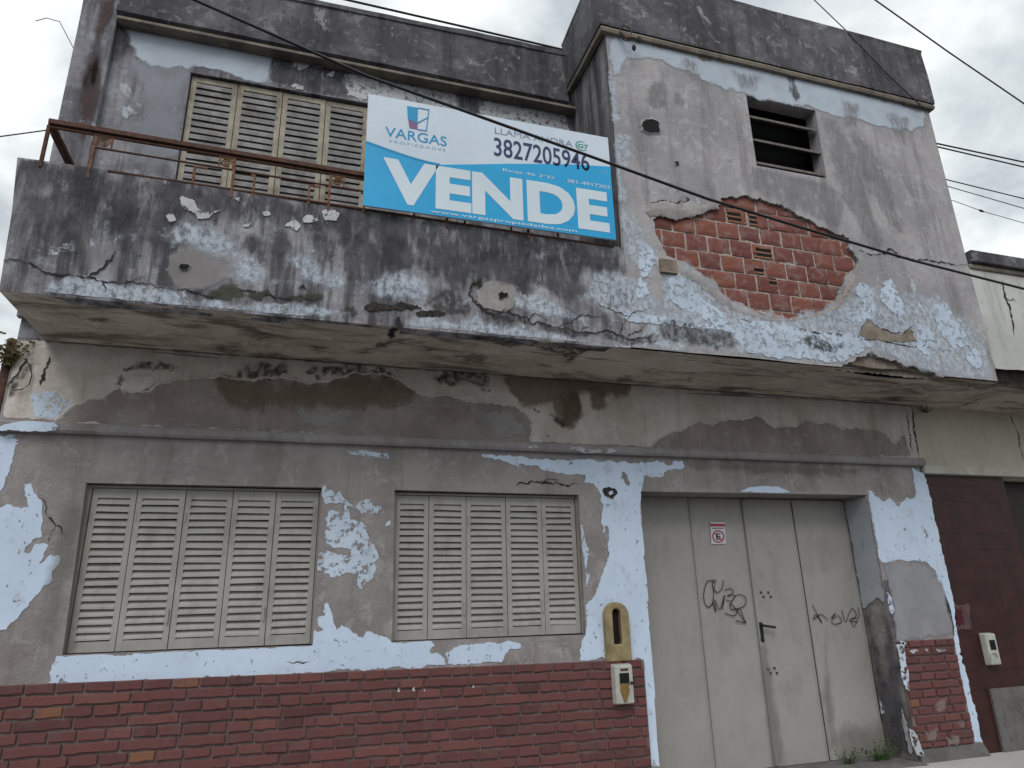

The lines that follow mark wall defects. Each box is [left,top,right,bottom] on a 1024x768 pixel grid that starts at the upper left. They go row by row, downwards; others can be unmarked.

peeling [126,29,273,162]
peeling [609,37,925,131]
crack [3,250,215,300]
peeling [166,196,260,283]
damp [244,235,291,260]
crack [468,282,650,340]
peeling [584,118,989,381]
crack [1002,280,1015,336]
crack [7,358,50,387]
damp [216,342,525,438]
damp [505,376,633,428]
flaking render [0,371,983,766]